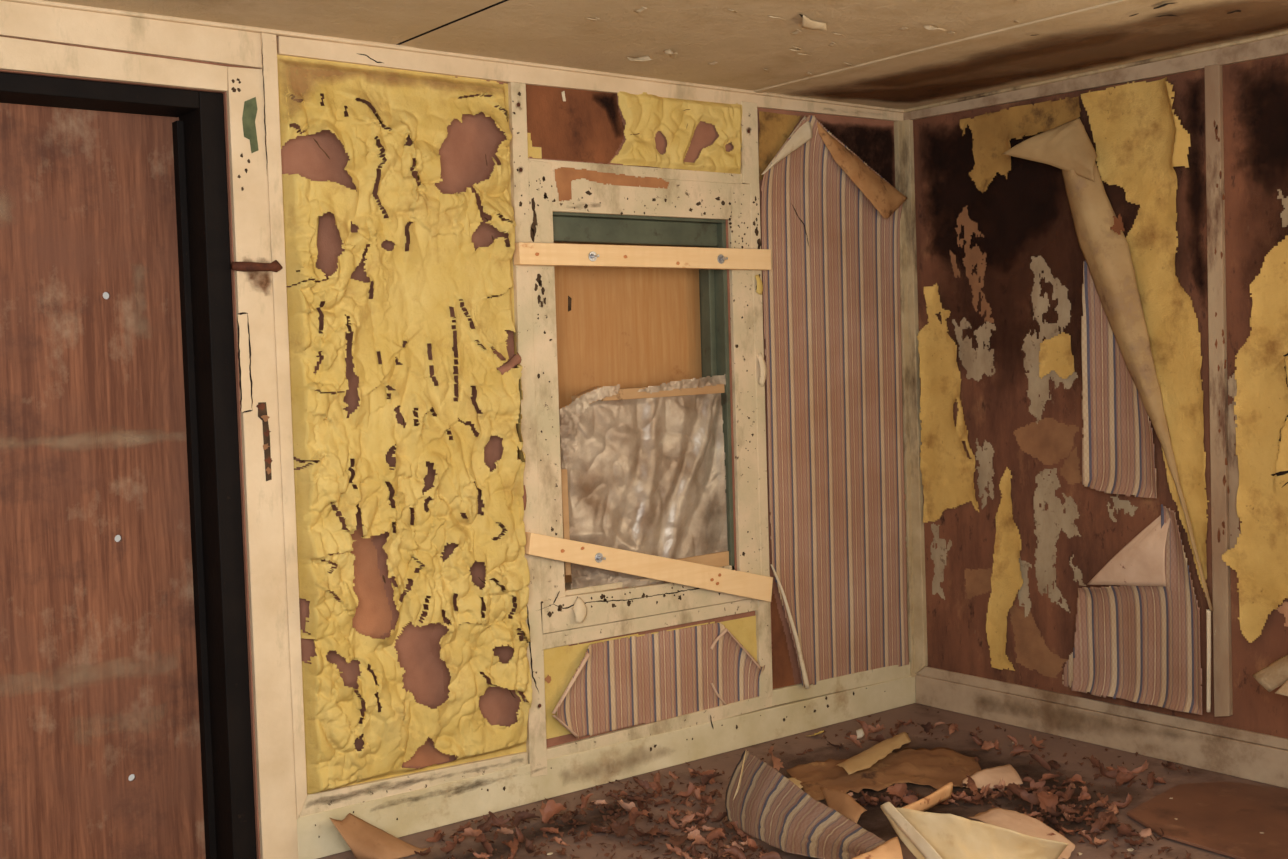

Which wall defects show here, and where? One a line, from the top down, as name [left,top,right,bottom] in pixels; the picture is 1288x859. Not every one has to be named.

crack [260,43,268,159]
peeling [277,54,763,794]
peeling [734,345,767,397]
peeling [1013,418,1079,465]